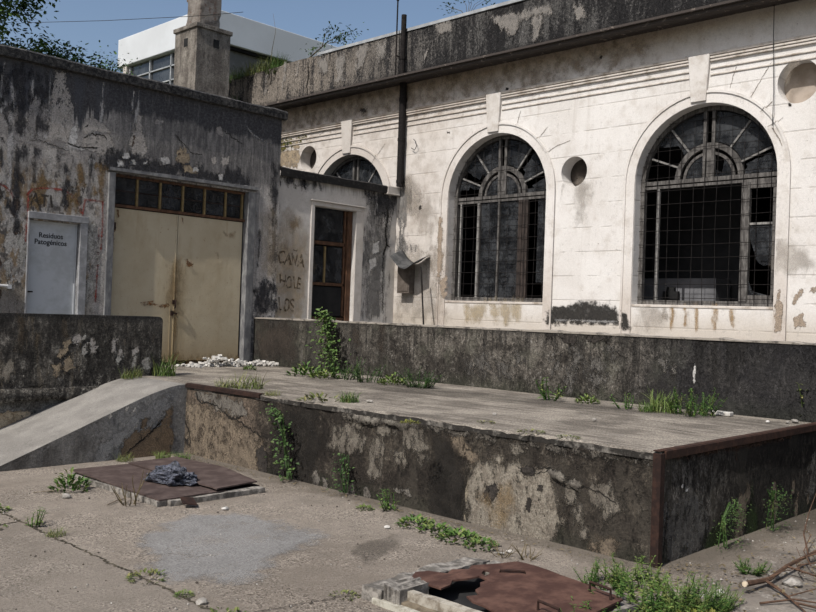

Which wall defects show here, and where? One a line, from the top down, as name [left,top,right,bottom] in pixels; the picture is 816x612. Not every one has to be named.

leakage [0,62,53,242]
leakage [88,147,250,190]
leakage [253,162,321,362]
leakage [361,181,416,351]
leakage [545,300,630,330]
peeling [774,286,816,332]
spalling [52,333,99,378]
peeling [112,338,151,371]
spalling [184,391,268,473]
crack [196,393,268,438]
spalling [325,412,652,558]
crack [255,594,361,612]